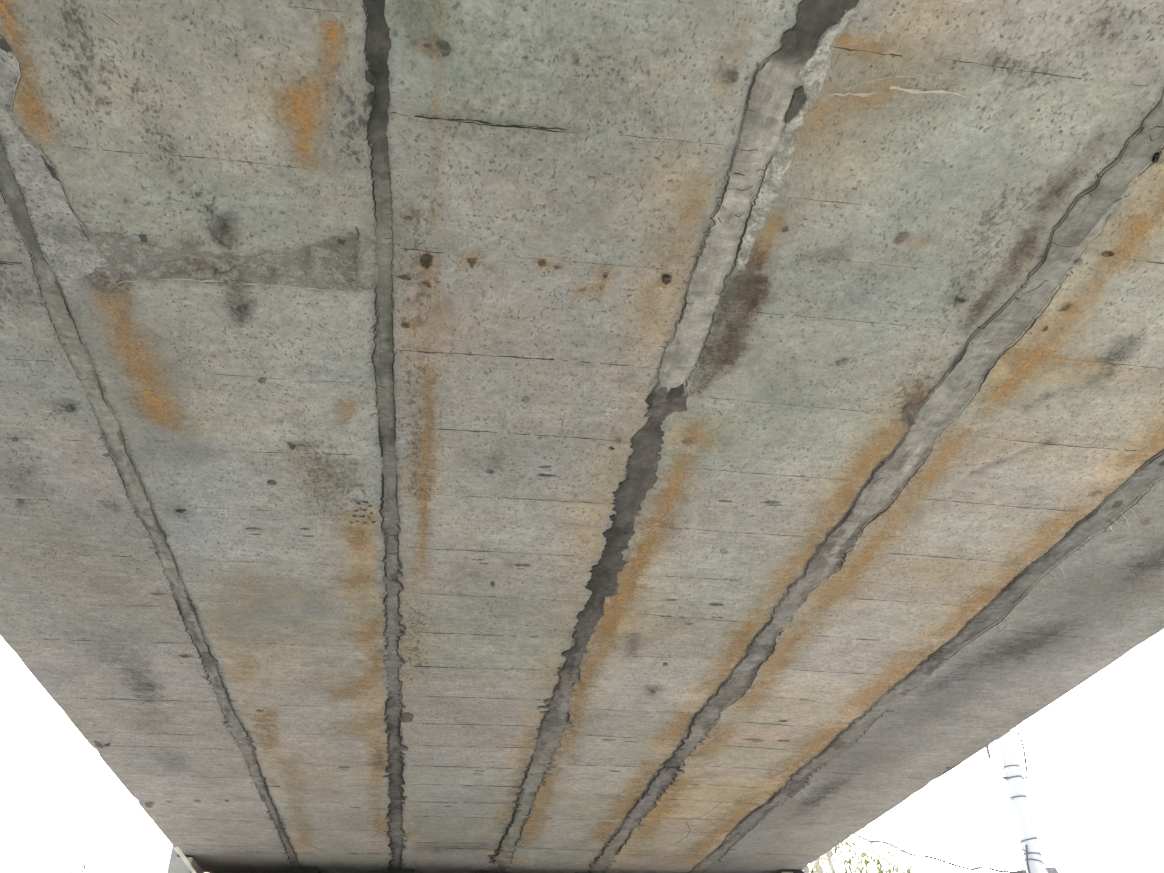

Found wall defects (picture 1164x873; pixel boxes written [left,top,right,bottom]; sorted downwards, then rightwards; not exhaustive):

crack [0,190,298,864]
crack [362,5,777,869]
spalling [736,0,869,271]
crack [589,126,1164,869]